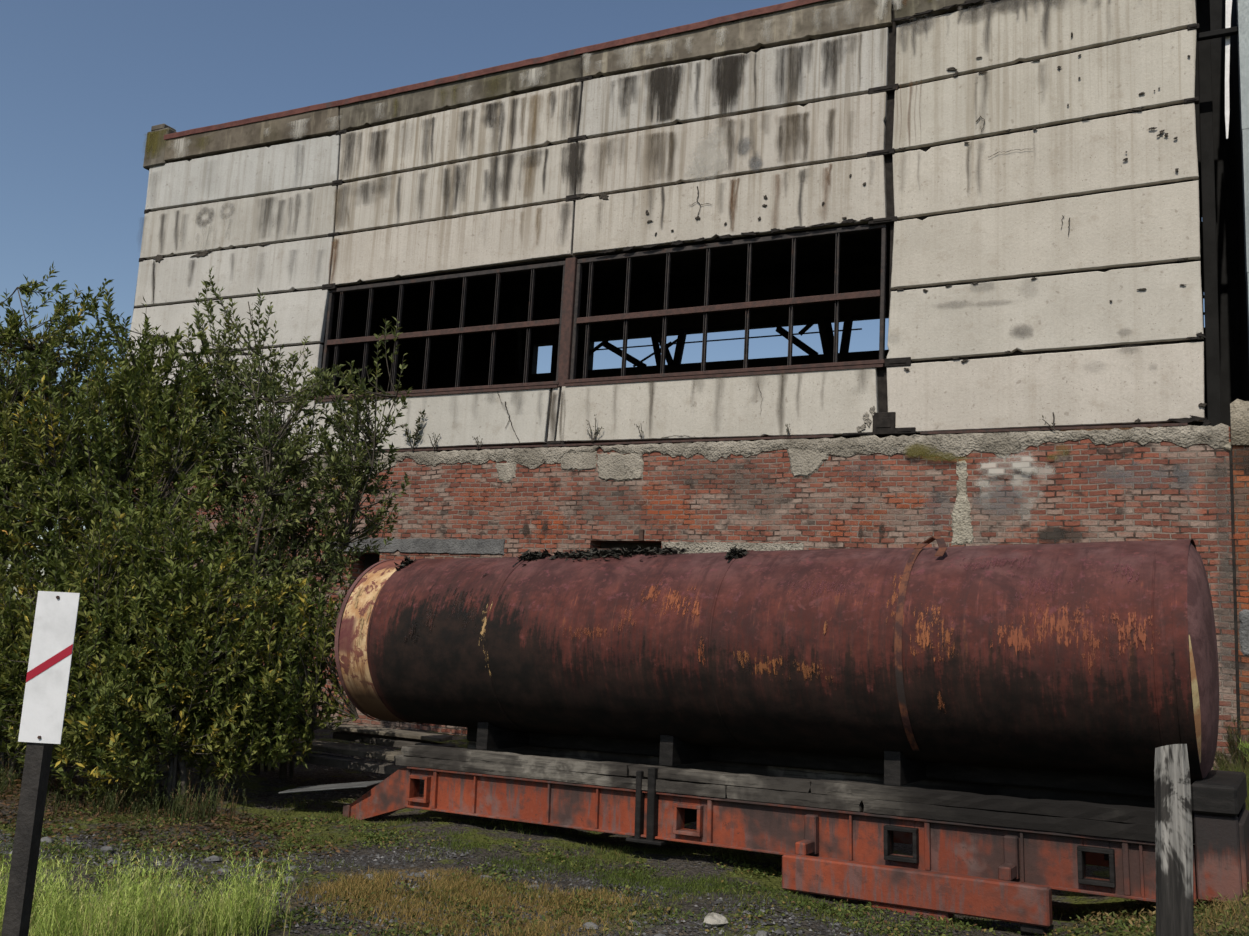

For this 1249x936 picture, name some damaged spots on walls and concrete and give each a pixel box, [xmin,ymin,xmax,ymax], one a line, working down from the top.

damp [780,46,803,92]
damp [824,40,837,79]
damp [551,85,579,123]
damp [694,54,761,170]
damp [147,129,184,156]
damp [372,131,382,163]
damp [462,99,517,202]
damp [623,40,681,225]
damp [779,113,808,152]
damp [443,165,466,205]
damp [562,142,585,227]